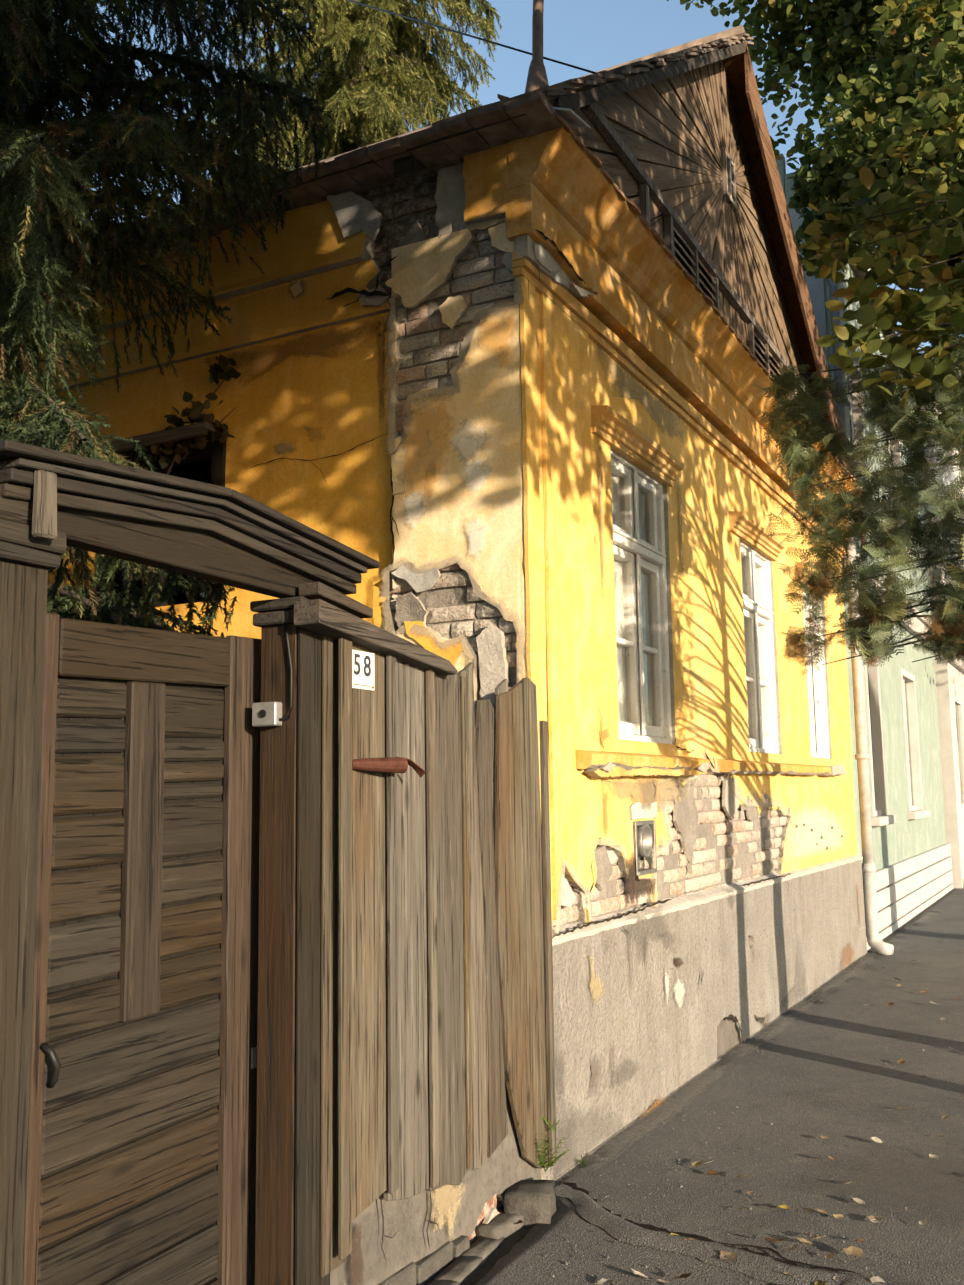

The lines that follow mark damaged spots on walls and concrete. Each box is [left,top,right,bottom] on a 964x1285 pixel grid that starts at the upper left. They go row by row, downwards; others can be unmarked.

flaking render [326,161,529,456]
peeling [532,244,560,272]
peeling [569,283,595,298]
flaking render [382,555,525,714]
flaking render [552,755,843,935]
flaking render [717,1014,744,1058]